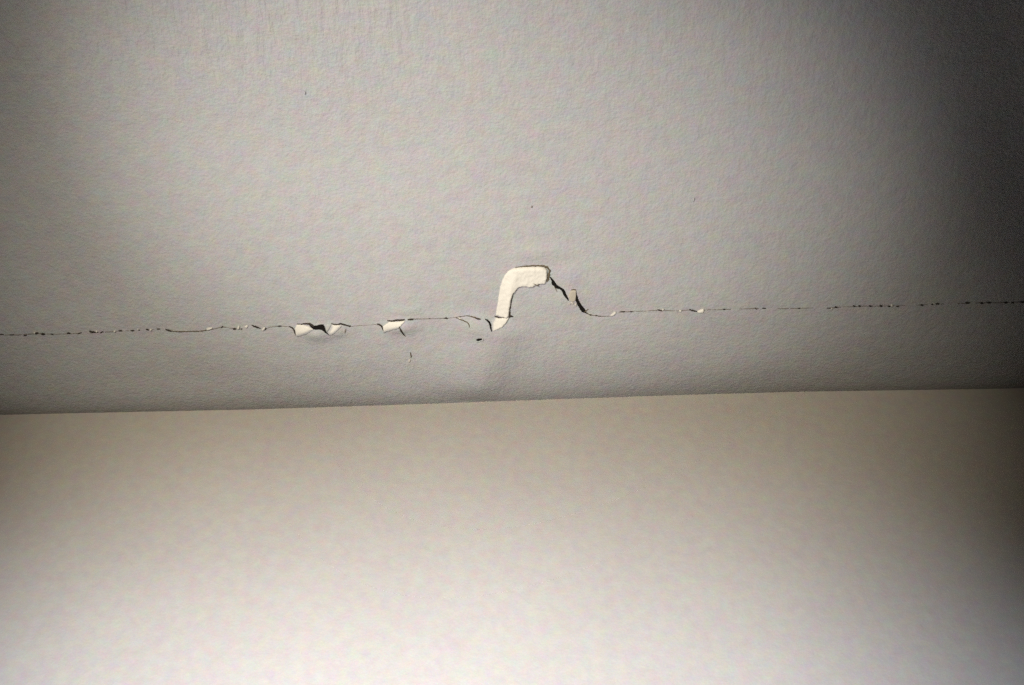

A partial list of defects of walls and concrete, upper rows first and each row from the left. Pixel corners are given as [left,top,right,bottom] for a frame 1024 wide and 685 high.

peeling [469,217,629,339]
crack [550,277,1024,317]
crack [0,325,289,336]
peeling [280,291,443,353]
crack [413,304,524,343]